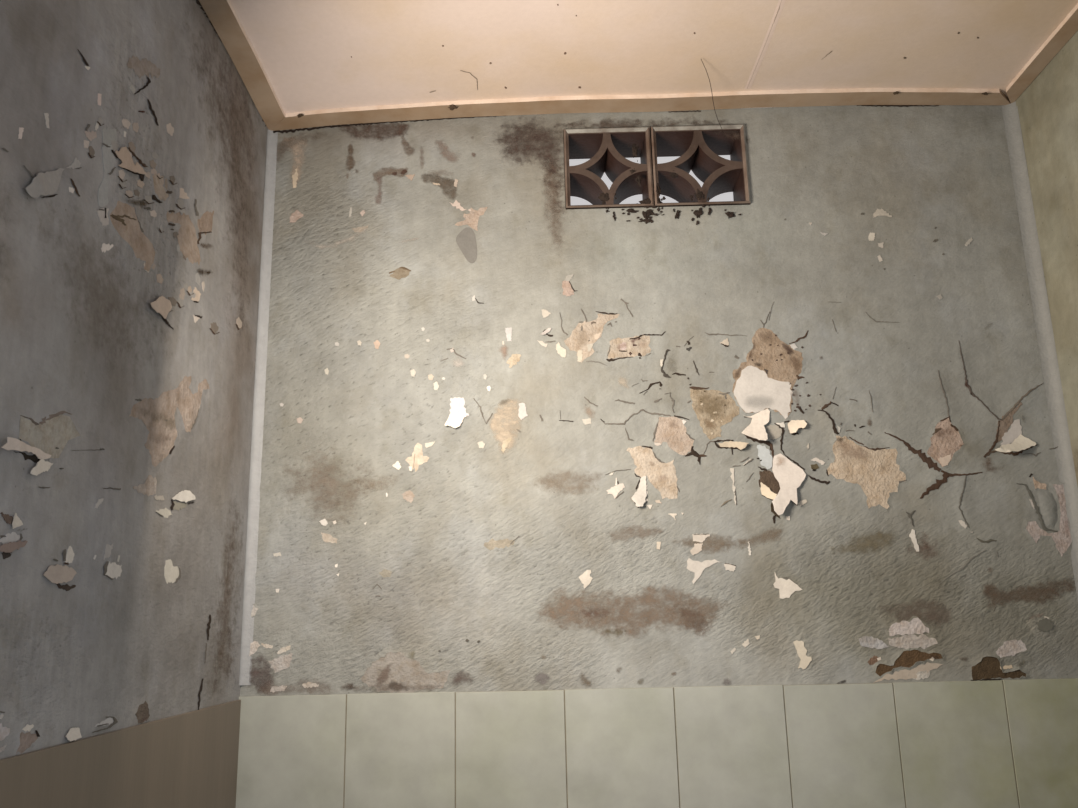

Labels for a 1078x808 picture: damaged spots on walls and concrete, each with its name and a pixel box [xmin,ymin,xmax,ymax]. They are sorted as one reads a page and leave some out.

water stain [342,124,407,139]
water stain [374,168,456,203]
peeling [23,117,220,335]
crack [539,302,774,441]
flaking render [606,325,807,523]
crack [685,441,714,464]
crack [774,423,830,484]
crack [818,342,1043,584]
water stain [544,587,717,635]
water stain [984,583,1073,604]
flaking render [868,648,947,683]
flaking render [967,635,1031,681]